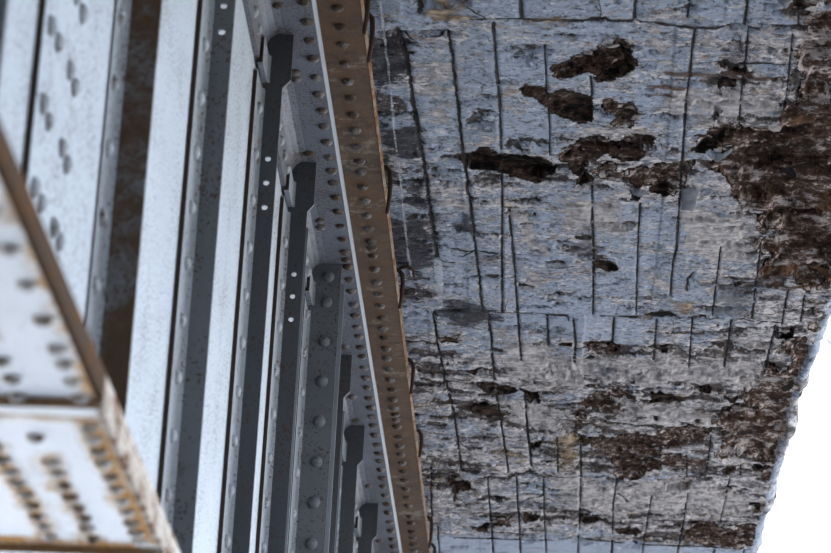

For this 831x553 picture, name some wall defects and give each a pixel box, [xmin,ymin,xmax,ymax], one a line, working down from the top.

crack [416,0,424,15]
crack [465,0,635,23]
spalling [456,0,831,294]
crack [394,27,604,509]
rust [57,312,99,400]
spalling [436,330,460,343]
crack [599,312,784,334]
peeling [468,306,821,549]
rust [0,453,138,548]
rust [75,417,155,545]
spalling [426,475,479,543]
crack [427,466,741,553]